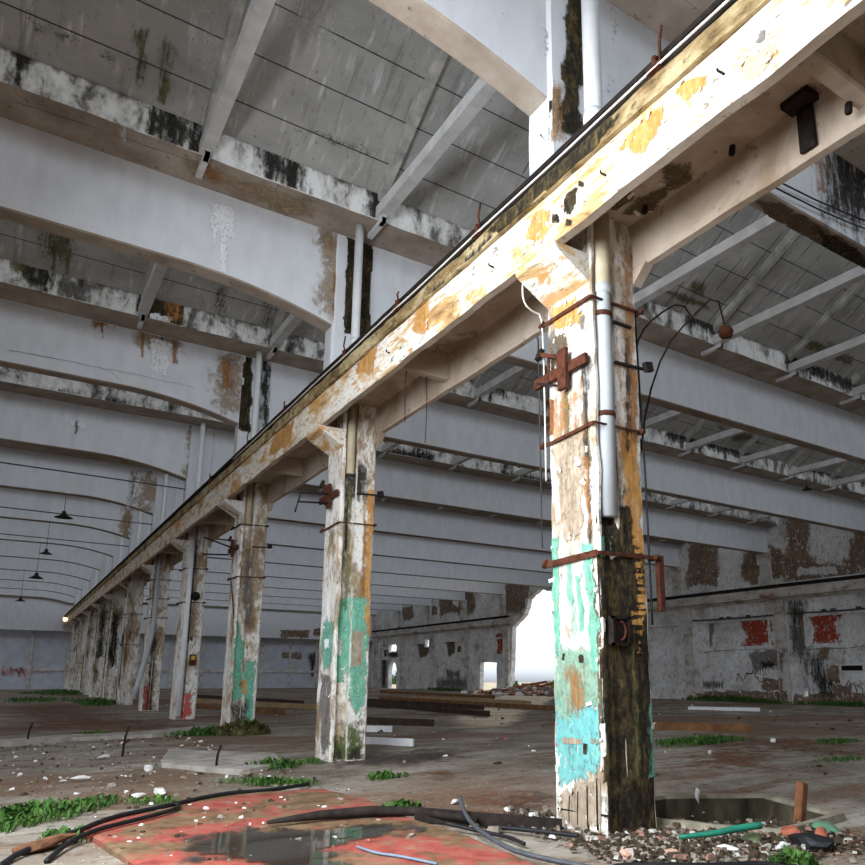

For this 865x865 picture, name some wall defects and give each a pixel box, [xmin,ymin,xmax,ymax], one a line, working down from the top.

leakage [550,0,583,137]
peeling [618,105,667,155]
leakage [465,114,618,262]
peeling [525,180,583,247]
leakage [756,154,865,269]
leakage [314,229,373,336]
peeling [546,295,583,371]
corrosion [620,369,647,654]
flaking render [767,519,865,582]
peeling [280,594,369,755]
peeling [548,432,617,830]
flaking render [689,614,865,705]